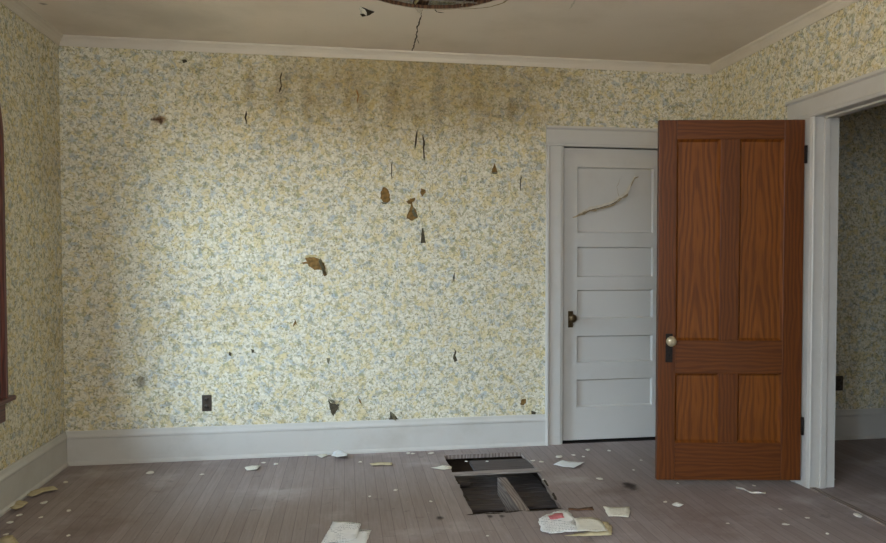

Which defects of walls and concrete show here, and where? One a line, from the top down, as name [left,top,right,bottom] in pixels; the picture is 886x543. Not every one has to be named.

crack [412,10,423,50]
crack [573,176,638,218]